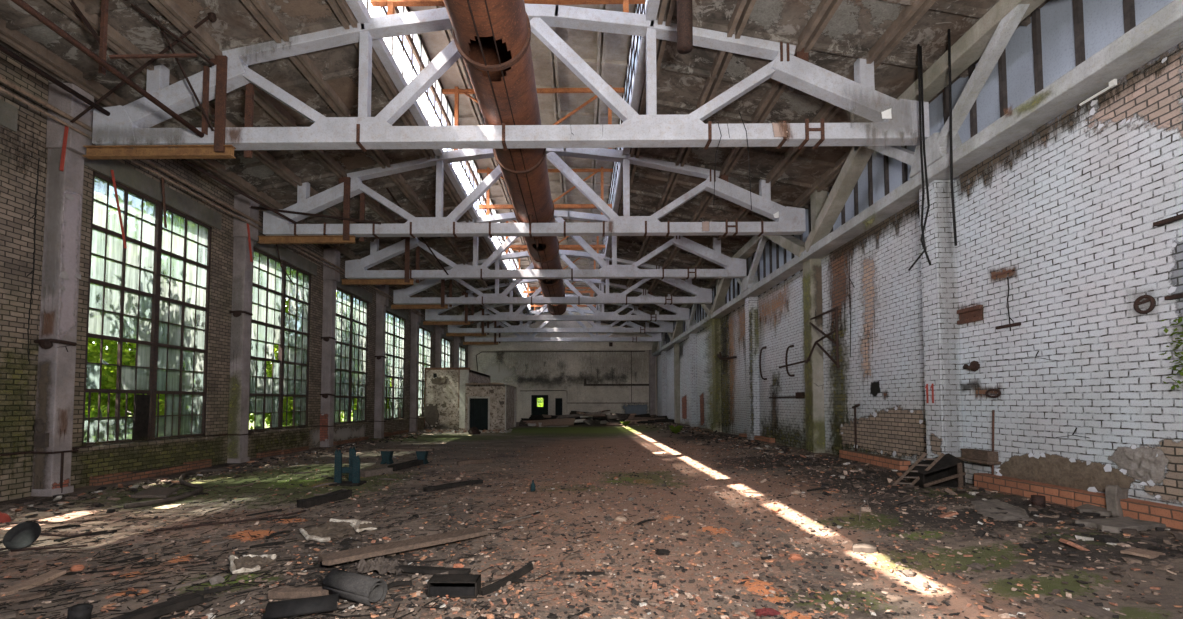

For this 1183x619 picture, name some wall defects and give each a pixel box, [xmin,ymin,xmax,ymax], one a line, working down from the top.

damp [958,42,1183,197]
peeling [1086,50,1183,139]
corrosion [827,245,874,377]
peeling [839,381,942,459]
flaking render [994,438,1183,504]